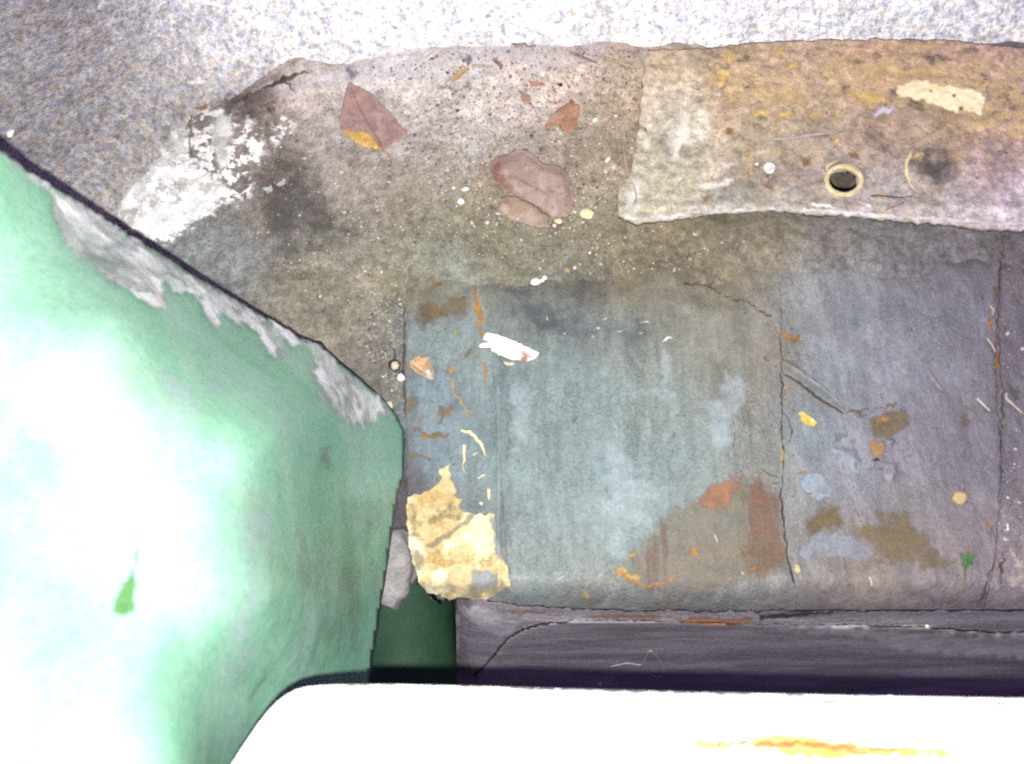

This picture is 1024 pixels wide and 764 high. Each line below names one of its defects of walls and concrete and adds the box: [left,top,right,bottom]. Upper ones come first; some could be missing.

peeling [819,42,1024,140]
peeling [670,118,690,160]
peeling [699,158,735,189]
rust [474,287,484,338]
rust [407,367,473,439]
peeling [461,430,486,470]
crack [683,283,794,583]
peeling [406,465,510,600]
rust [616,476,785,591]
crack [978,558,1005,604]
crack [473,619,733,677]
crack [755,611,1024,634]